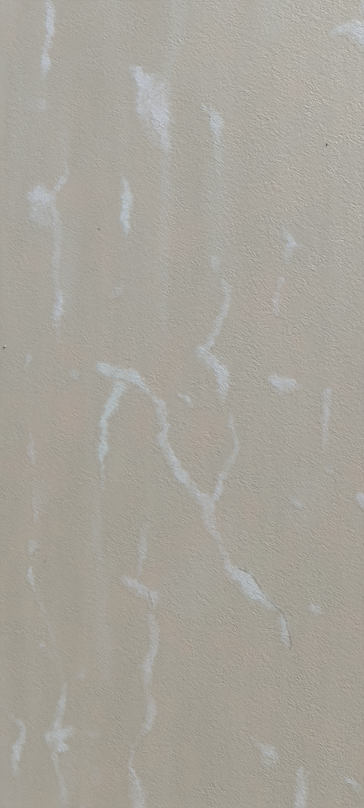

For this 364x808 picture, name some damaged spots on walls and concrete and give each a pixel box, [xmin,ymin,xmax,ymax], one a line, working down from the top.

leakage [38,0,58,83]
leakage [122,63,176,157]
leakage [23,160,70,346]
leakage [117,172,136,238]
leakage [91,254,291,649]
leakage [118,513,163,808]
leakage [41,671,87,808]